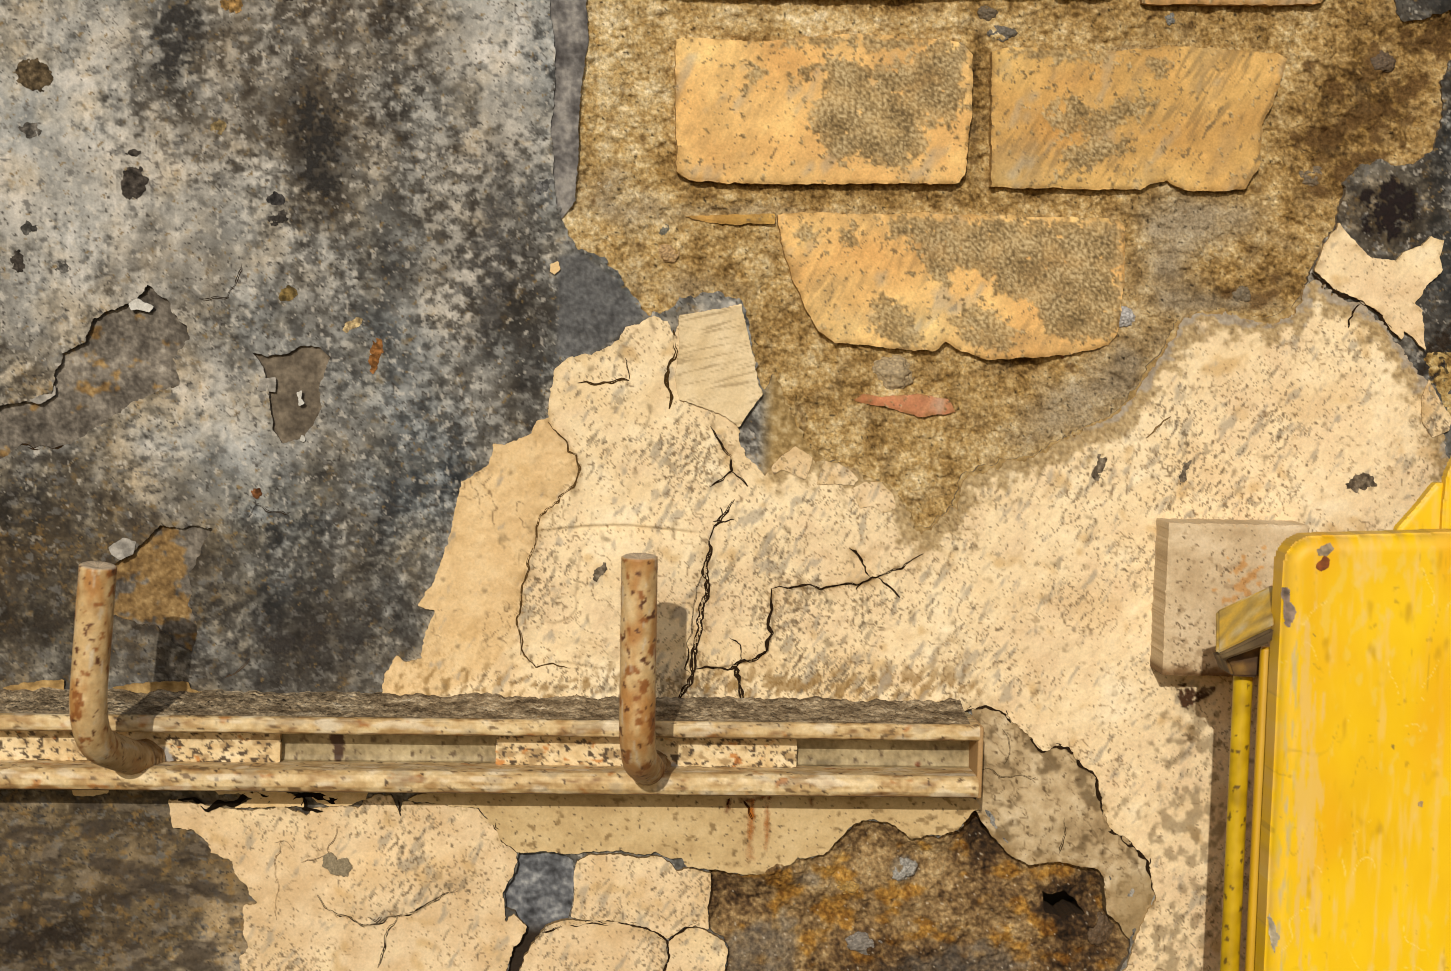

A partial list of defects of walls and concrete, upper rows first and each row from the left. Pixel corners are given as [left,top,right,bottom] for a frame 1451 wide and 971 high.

peeling [266,191,289,226]
peeling [0,285,190,459]
peeling [278,285,298,303]
peeling [254,345,330,443]
peeling [342,317,363,333]
peeling [368,338,384,374]
crack [578,330,678,409]
spalling [382,0,1451,971]
crack [516,422,581,668]
crack [678,426,922,698]
spalling [168,791,1129,971]
crack [540,903,696,971]